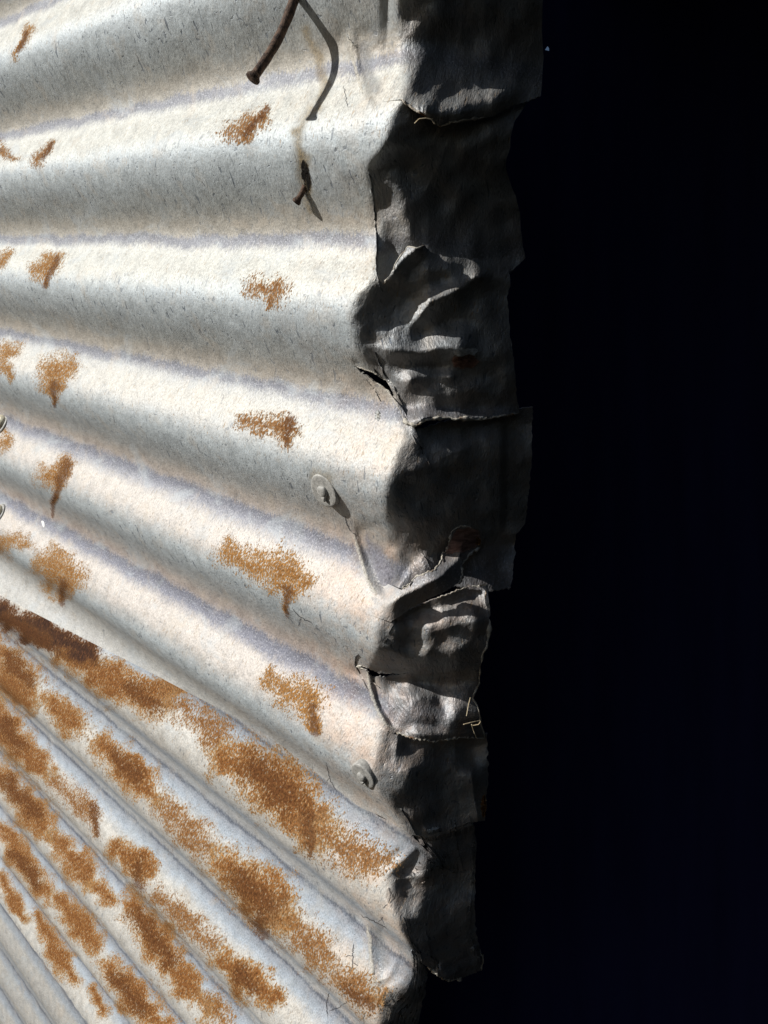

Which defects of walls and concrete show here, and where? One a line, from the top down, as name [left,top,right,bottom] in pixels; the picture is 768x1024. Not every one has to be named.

corrosion [11,20,38,63]
corrosion [215,102,272,147]
corrosion [0,140,55,169]
corrosion [26,248,68,289]
corrosion [239,272,293,312]
corrosion [32,350,83,405]
corrosion [233,407,302,453]
corrosion [29,452,78,505]
corrosion [0,529,405,1024]